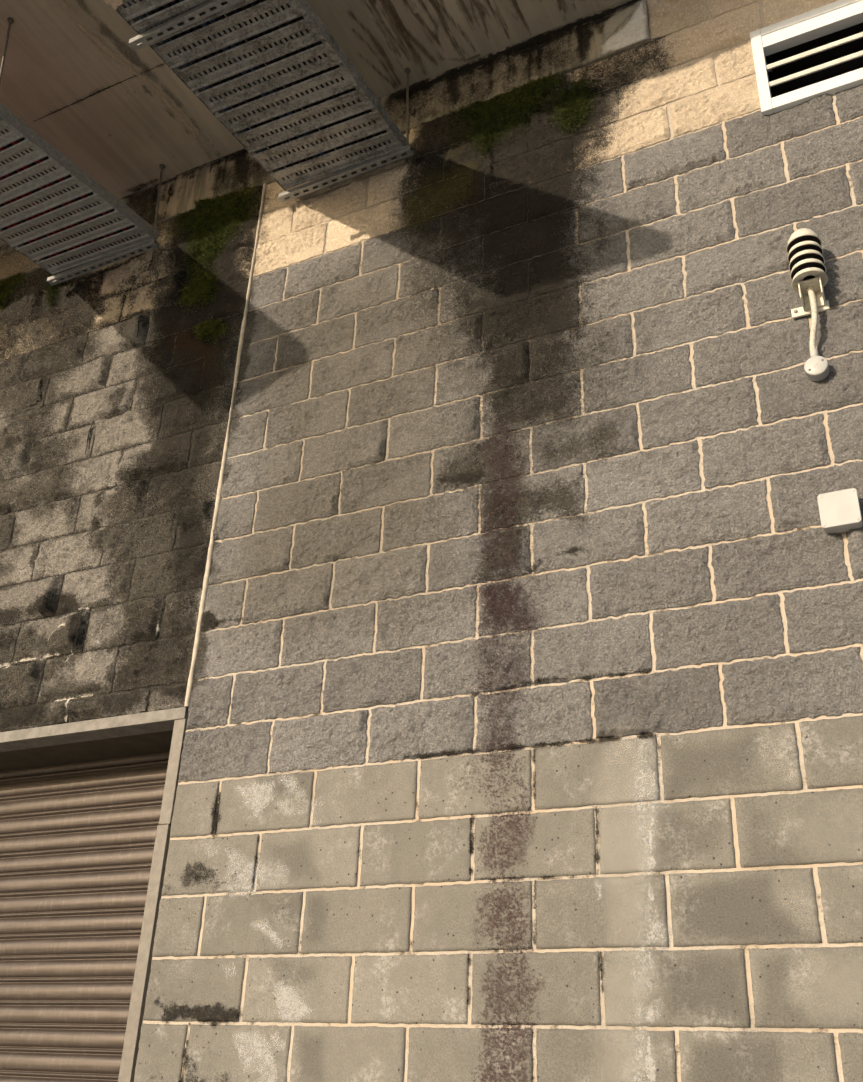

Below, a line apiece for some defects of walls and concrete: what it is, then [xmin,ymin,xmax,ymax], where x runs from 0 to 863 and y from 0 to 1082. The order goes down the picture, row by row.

leakage [349,0,673,582]
leakage [0,0,267,732]
leakage [471,675,595,697]
leakage [404,736,621,804]
leakage [181,855,265,892]
leakage [154,1000,242,1029]
leakage [631,1037,656,1082]